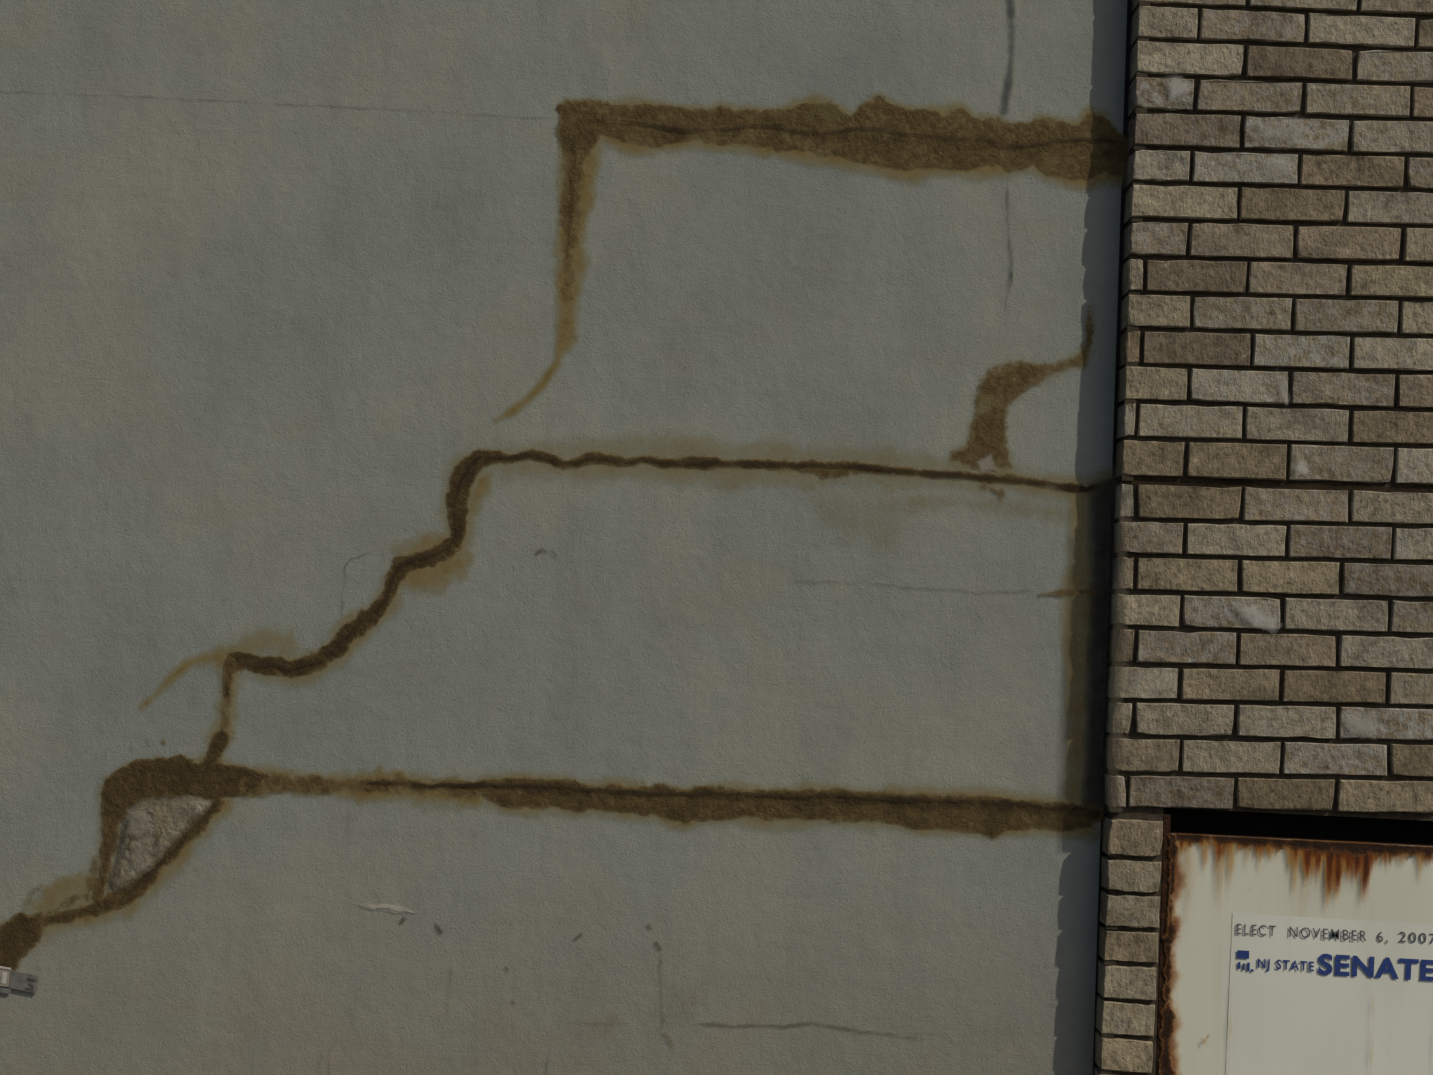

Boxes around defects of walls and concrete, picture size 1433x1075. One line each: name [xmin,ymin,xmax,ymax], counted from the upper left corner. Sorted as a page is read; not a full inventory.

crack [605,0,1121,147]
damp [496,95,1129,421]
damp [0,310,1125,970]
crack [239,452,1433,670]
spalling [107,796,212,893]
crack [378,782,1094,811]
corrosion [1159,834,1433,1075]